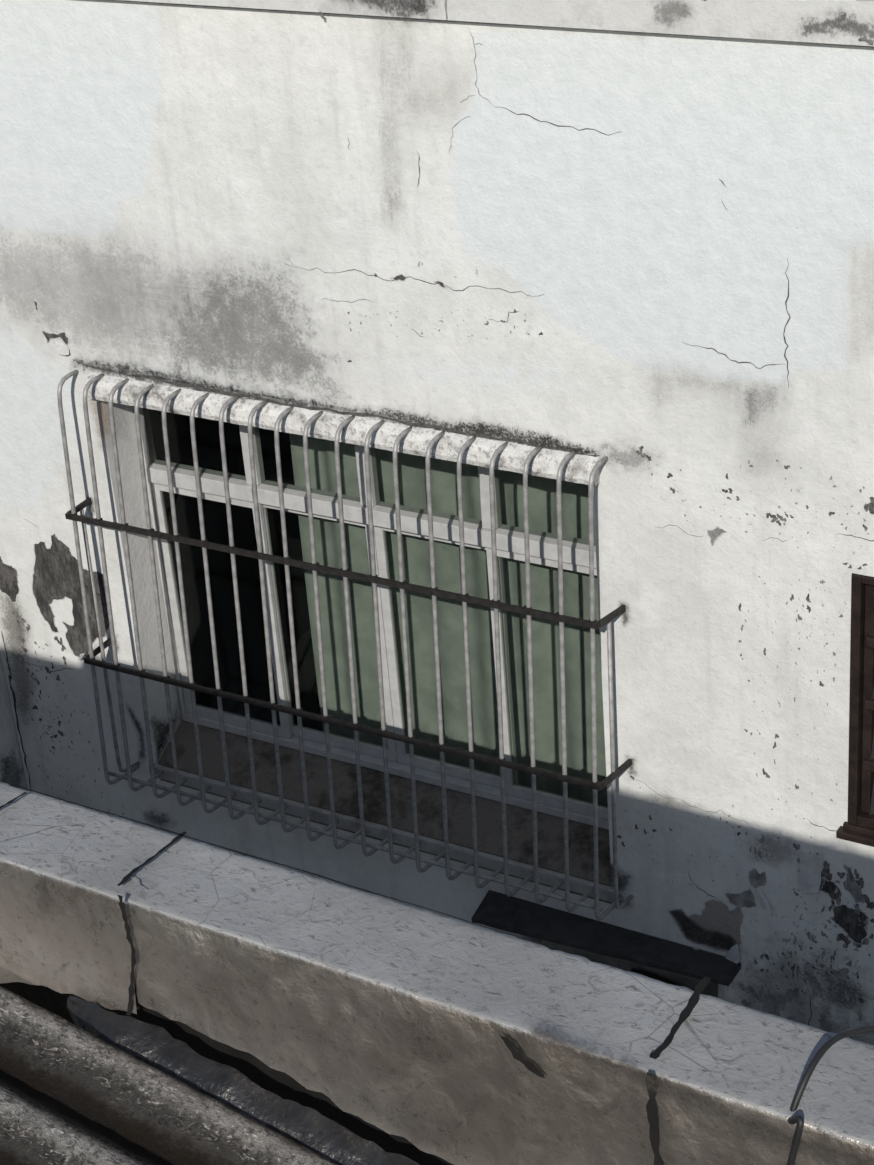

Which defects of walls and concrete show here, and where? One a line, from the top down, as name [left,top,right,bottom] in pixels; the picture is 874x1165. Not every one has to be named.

leakage [352,0,435,19]
crack [117,0,874,154]
leakage [801,12,874,38]
crack [286,264,541,322]
crack [682,257,790,388]
peeling [661,460,874,570]
leakage [3,597,30,713]
peeling [0,533,124,815]
crack [0,631,571,1016]
peeling [668,805,874,1039]
crack [645,977,711,1165]